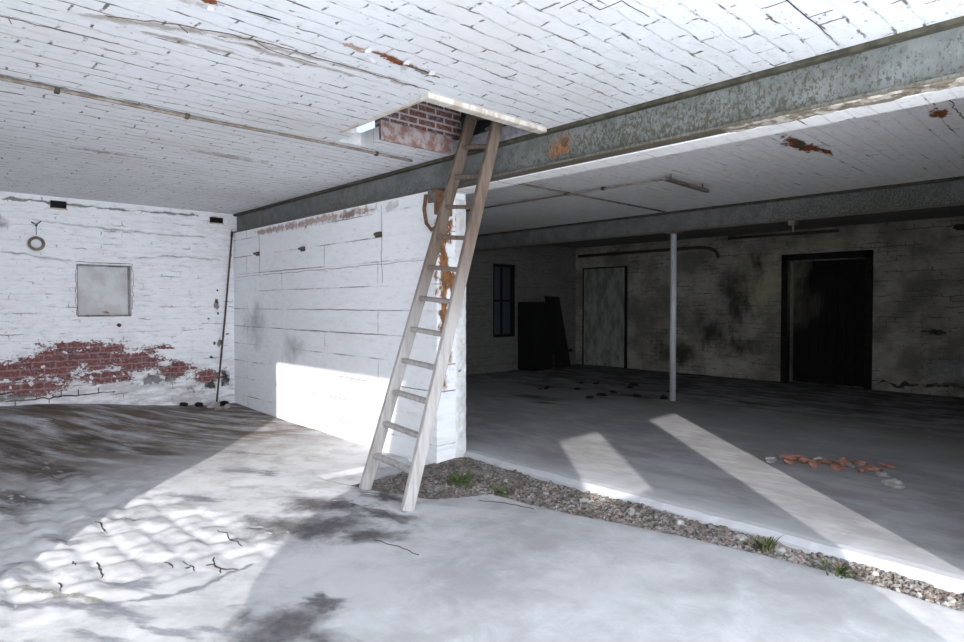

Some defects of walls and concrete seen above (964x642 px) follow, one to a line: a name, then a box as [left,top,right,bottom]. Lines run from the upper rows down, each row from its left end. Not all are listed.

crack [765,0,833,39]
rust [434,219,456,331]
peeling [0,333,229,397]
crack [164,530,242,573]
crack [58,561,104,591]